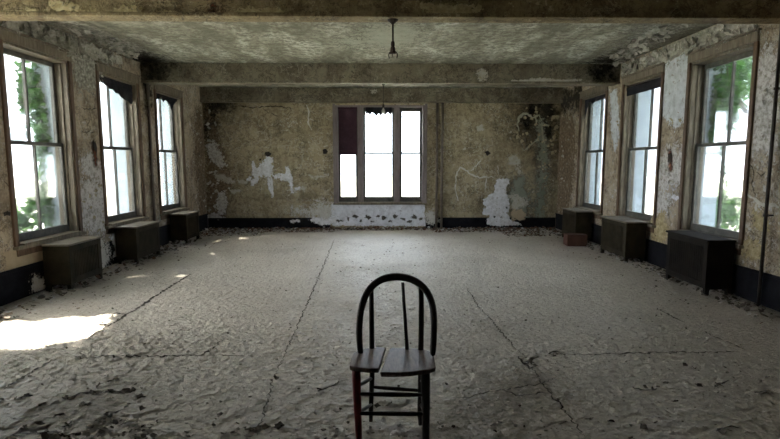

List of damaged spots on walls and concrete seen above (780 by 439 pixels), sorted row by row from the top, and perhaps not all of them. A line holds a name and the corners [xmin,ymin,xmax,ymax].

flaking render [196,133,440,227]
peeling [482,154,529,227]
damp [505,86,582,217]
peeling [596,23,780,218]
crack [88,274,191,338]
crack [550,349,738,357]